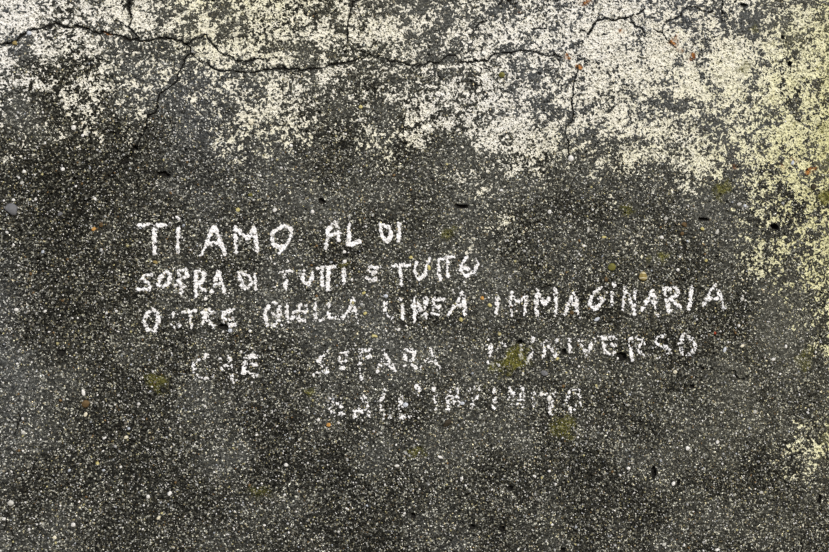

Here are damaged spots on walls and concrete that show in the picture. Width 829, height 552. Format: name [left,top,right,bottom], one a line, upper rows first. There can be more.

crack [0,0,579,245]
crack [580,1,723,48]